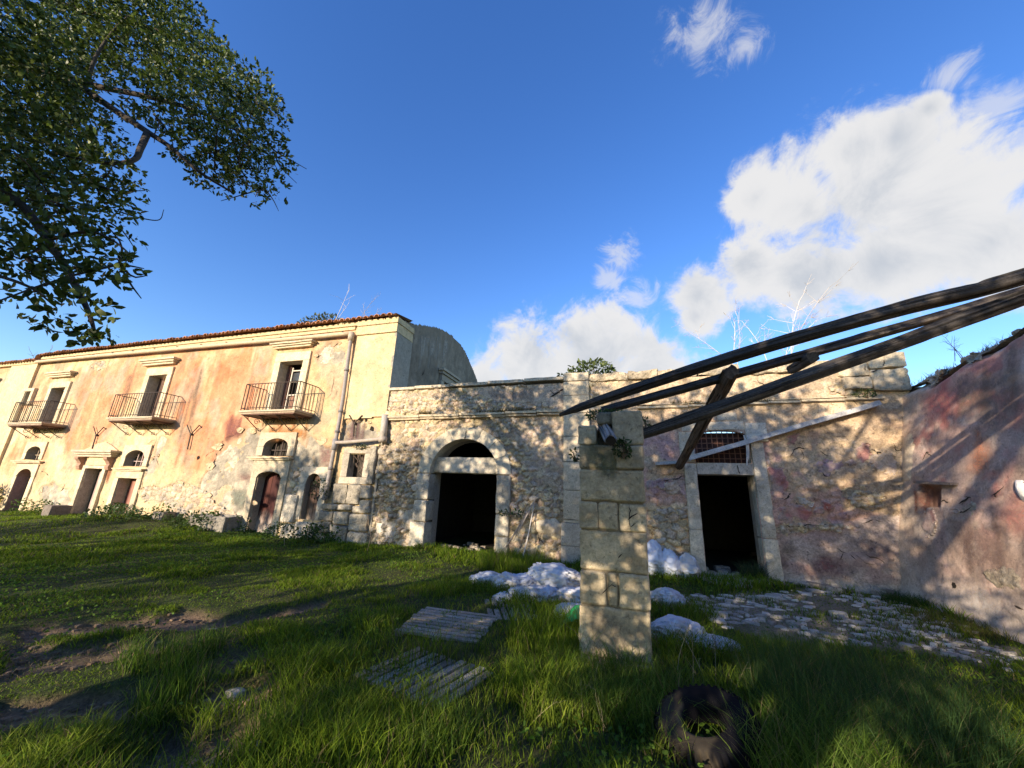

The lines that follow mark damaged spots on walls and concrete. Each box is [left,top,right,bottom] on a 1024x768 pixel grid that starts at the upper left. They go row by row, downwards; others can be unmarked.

flaking render [138,427,262,522]
flaking render [646,477,690,558]
crack [941,486,1004,513]